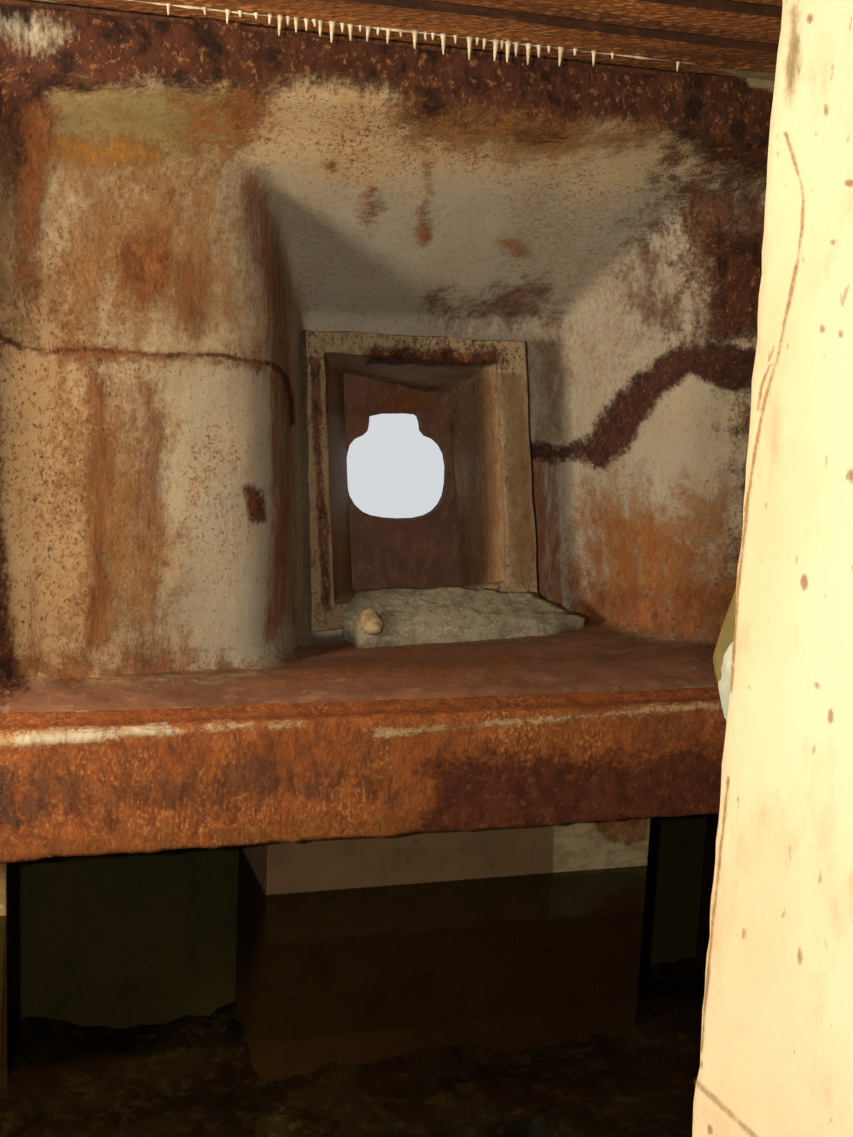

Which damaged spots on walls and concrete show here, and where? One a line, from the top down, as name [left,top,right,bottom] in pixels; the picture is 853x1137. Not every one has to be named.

crack [0,335,295,427]
rust [0,4,774,714]
rust [0,743,376,859]
rust [356,711,724,836]